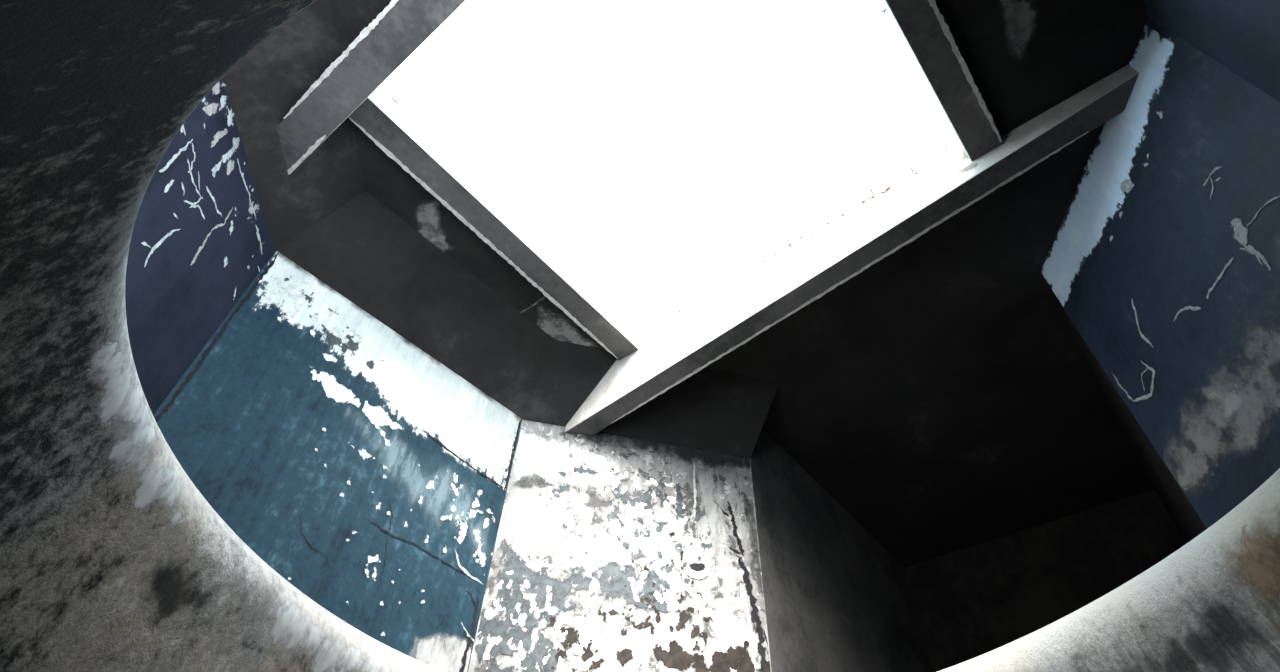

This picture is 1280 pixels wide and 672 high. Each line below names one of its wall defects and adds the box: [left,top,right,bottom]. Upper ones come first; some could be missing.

peeling [202,82,259,235]
peeling [611,25,1175,424]
crack [1239,196,1280,264]
peeling [247,241,771,672]
crack [693,458,768,672]